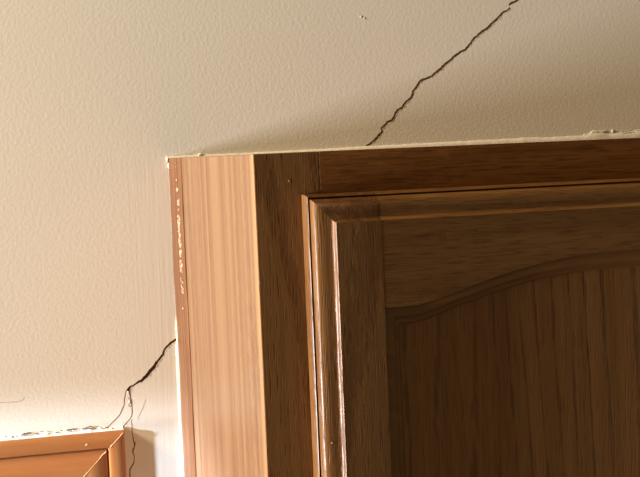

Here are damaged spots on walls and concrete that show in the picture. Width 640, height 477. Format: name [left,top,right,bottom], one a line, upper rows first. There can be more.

crack [366,0,518,146]
crack [108,338,176,477]